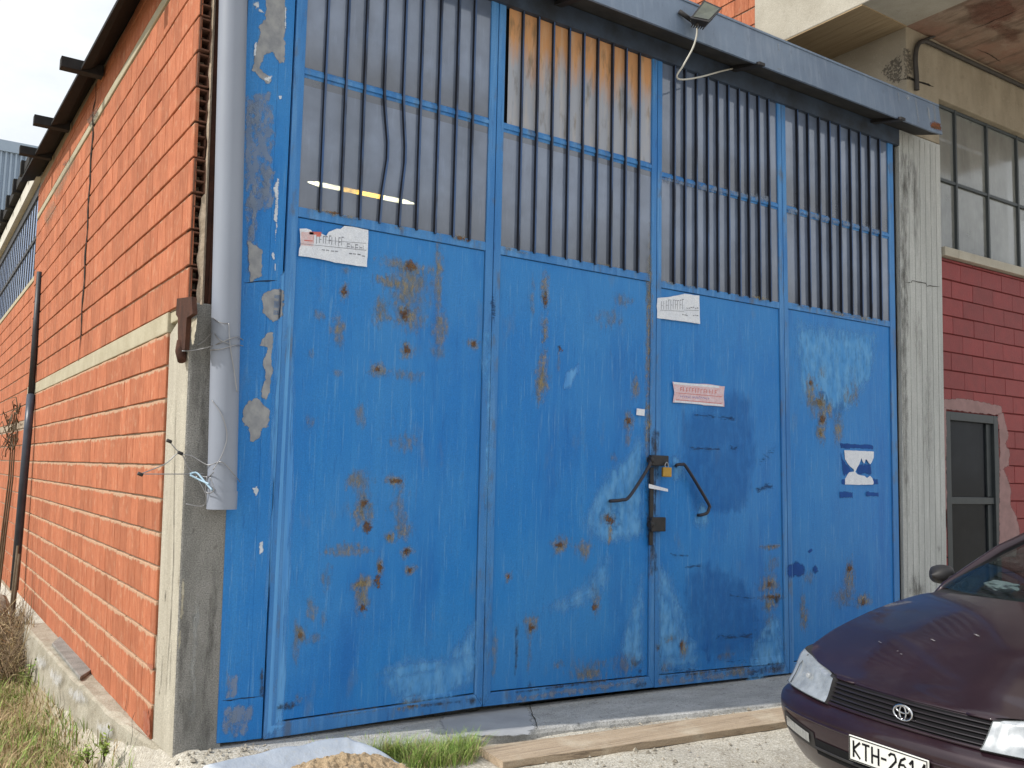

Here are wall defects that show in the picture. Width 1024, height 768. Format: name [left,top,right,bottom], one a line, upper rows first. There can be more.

peeling [245,0,287,282]
crack [78,89,96,360]
rust [376,259,424,327]
rust [633,274,653,394]
peeling [242,289,284,442]
rust [807,377,841,439]
rust [354,498,373,534]
rust [354,563,383,612]
rust [762,578,780,609]
rust [846,564,869,606]
peeling [223,676,252,737]